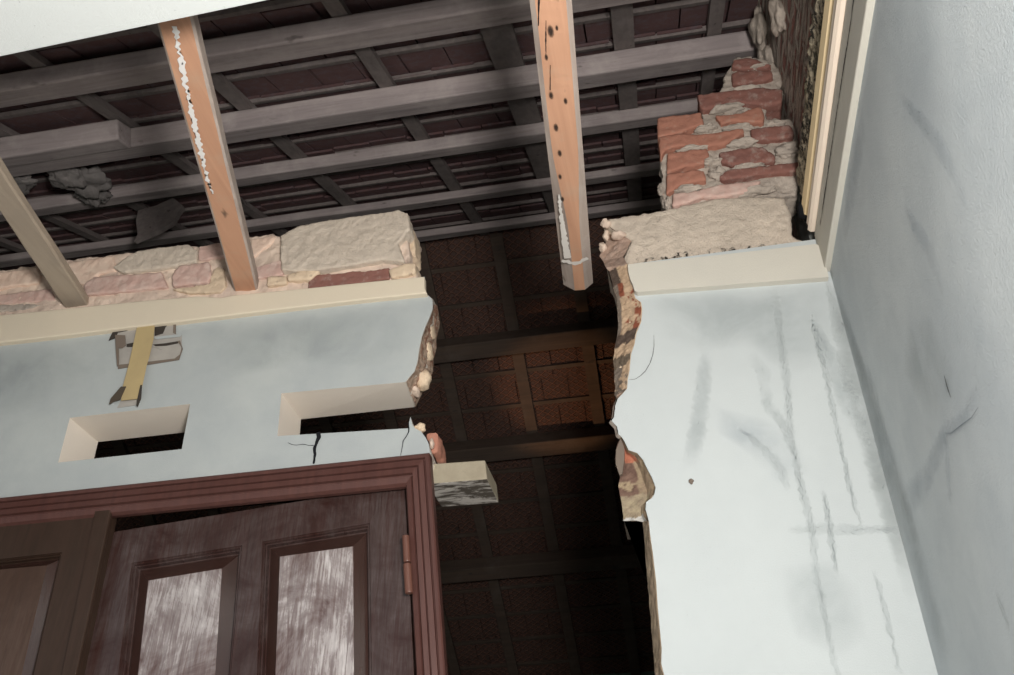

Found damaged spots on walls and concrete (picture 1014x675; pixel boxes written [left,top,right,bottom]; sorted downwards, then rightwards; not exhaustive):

spalling [109,325,183,408]
spalling [407,305,440,407]
spalling [599,218,655,522]
crack [289,432,321,464]
spalling [414,422,435,449]